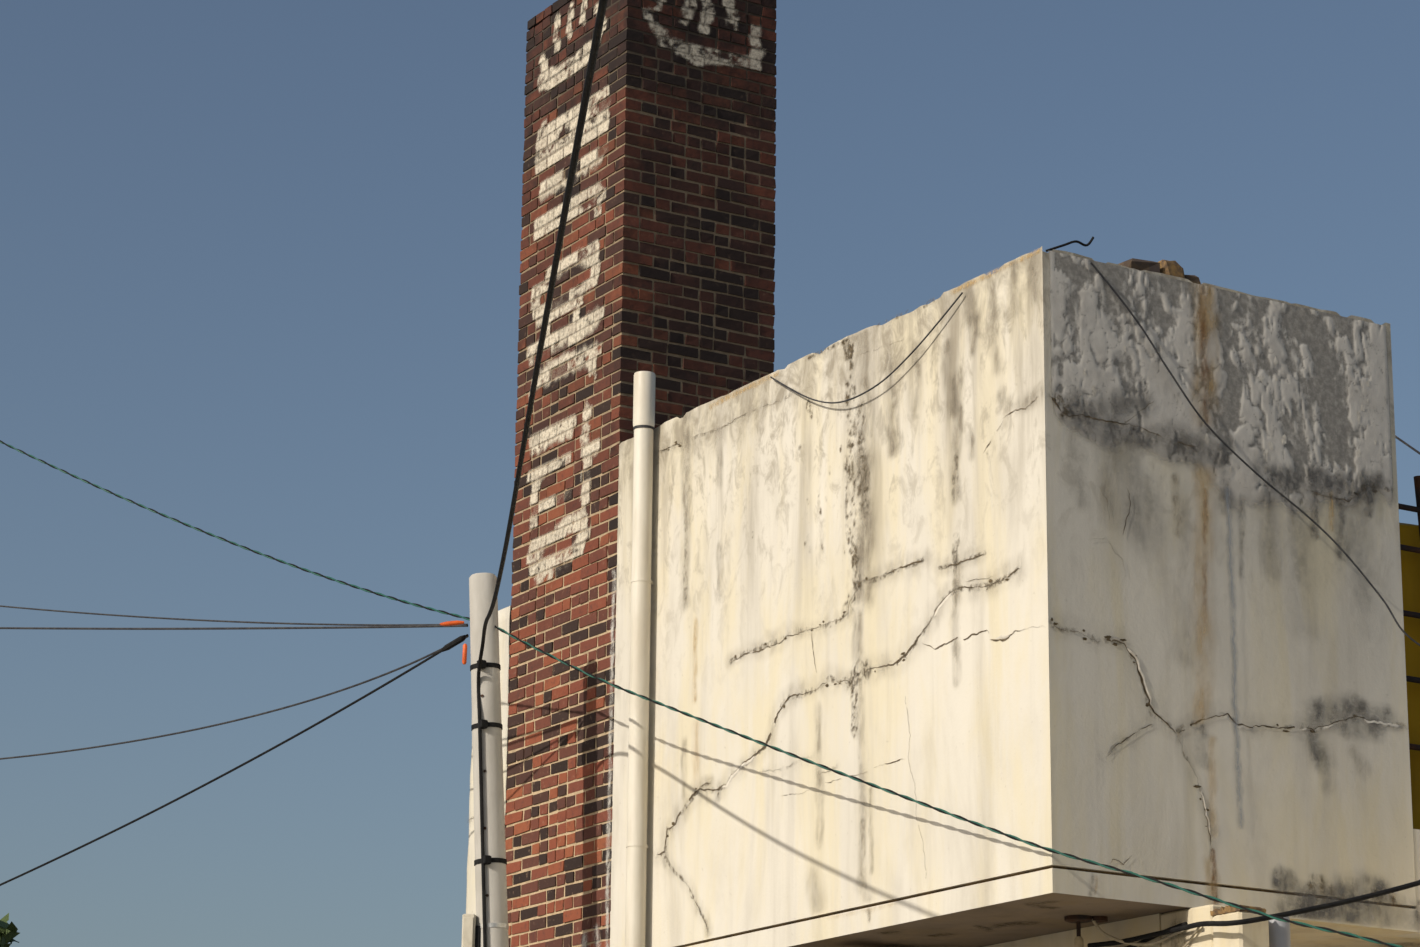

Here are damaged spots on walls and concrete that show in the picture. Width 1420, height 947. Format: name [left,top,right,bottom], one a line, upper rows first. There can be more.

damp [840,339,871,615]
crack [658,553,1404,928]
damp [1226,490,1242,826]
damp [1271,468,1345,556]